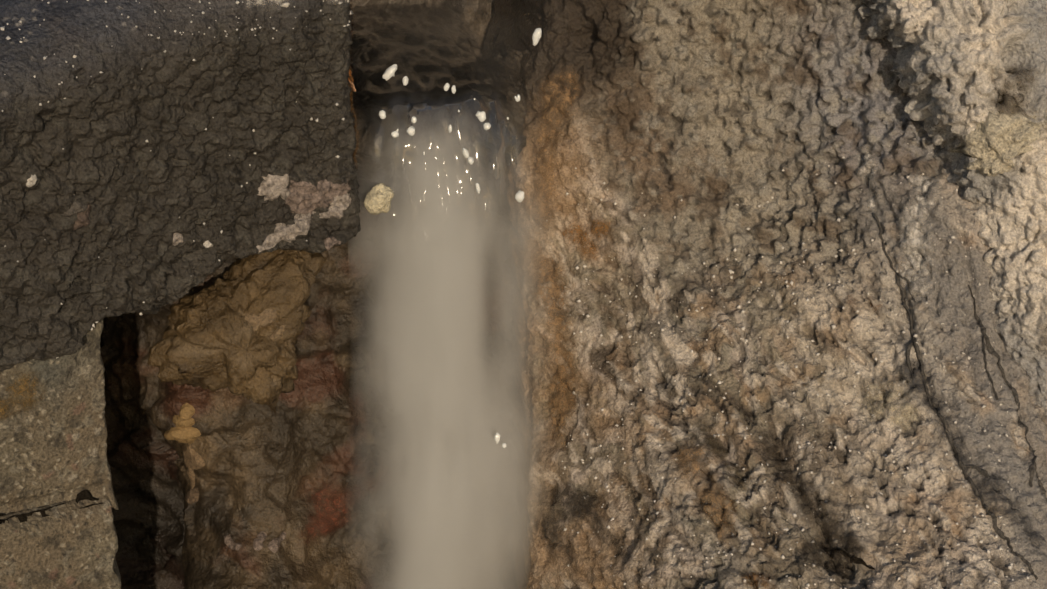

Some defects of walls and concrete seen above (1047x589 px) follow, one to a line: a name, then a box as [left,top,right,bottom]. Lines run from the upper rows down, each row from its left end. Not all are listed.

crack [0,490,103,524]